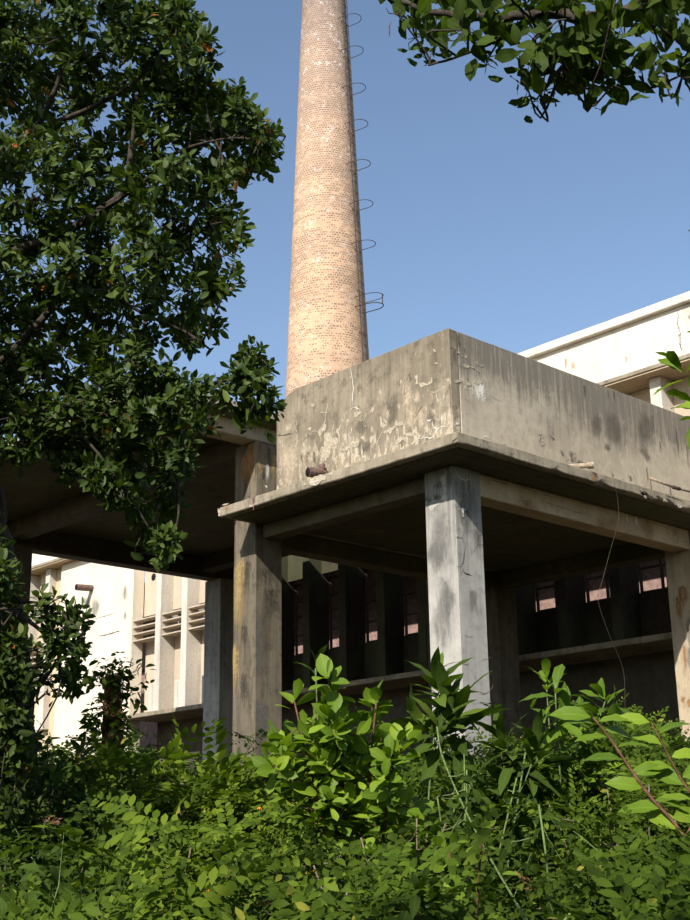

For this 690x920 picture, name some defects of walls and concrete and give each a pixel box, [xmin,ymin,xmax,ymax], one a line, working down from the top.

peeling [303,375,433,486]
water stain [473,384,486,402]